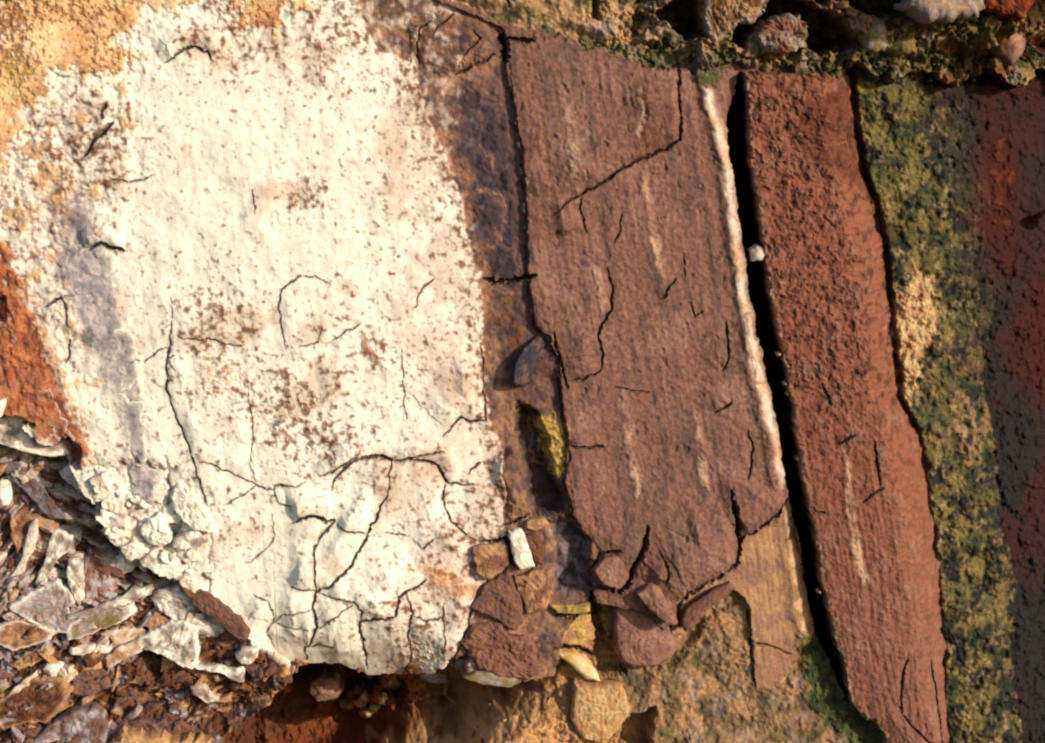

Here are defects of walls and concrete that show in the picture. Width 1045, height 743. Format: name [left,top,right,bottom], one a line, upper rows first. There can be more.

crack [413,0,686,304]
rust [0,233,102,473]
crack [43,296,73,364]
crack [275,274,361,350]
crack [414,277,435,310]
crack [543,73,835,658]
crack [140,297,538,671]
crack [837,434,886,504]
peeling [0,415,251,706]
crack [745,606,792,688]
peeling [26,703,122,743]
peeling [155,692,208,718]